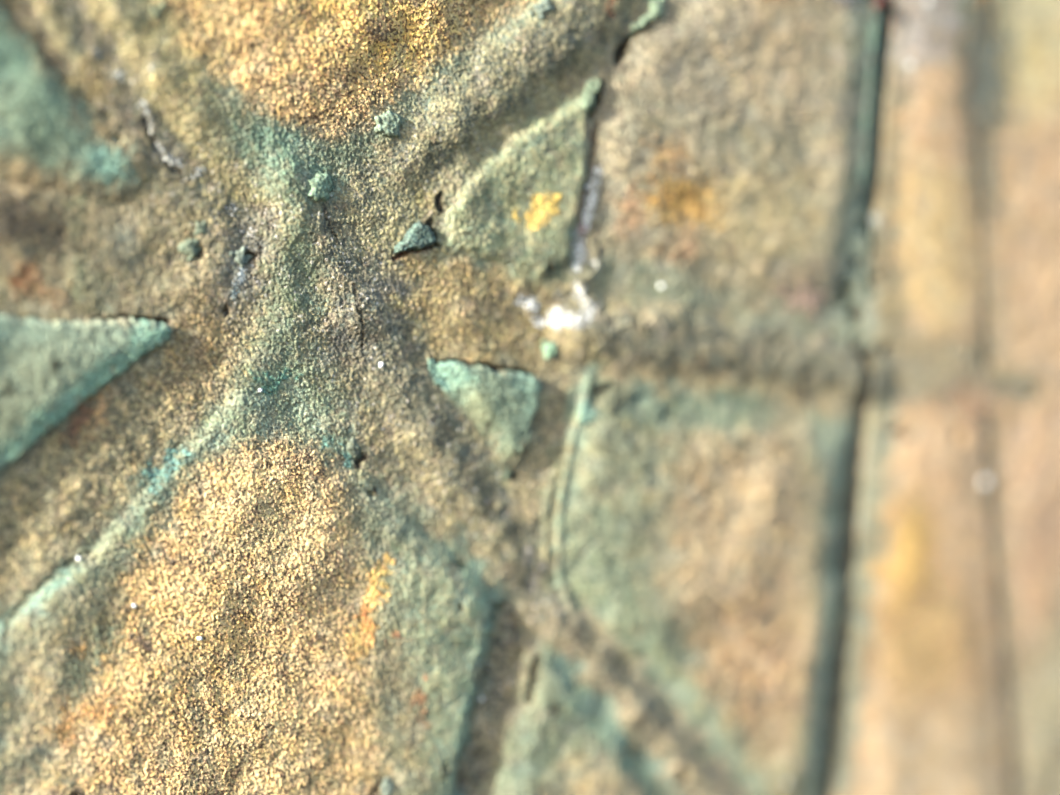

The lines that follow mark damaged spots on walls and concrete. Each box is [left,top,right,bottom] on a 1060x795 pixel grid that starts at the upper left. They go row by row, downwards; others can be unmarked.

crack [819,0,893,795]